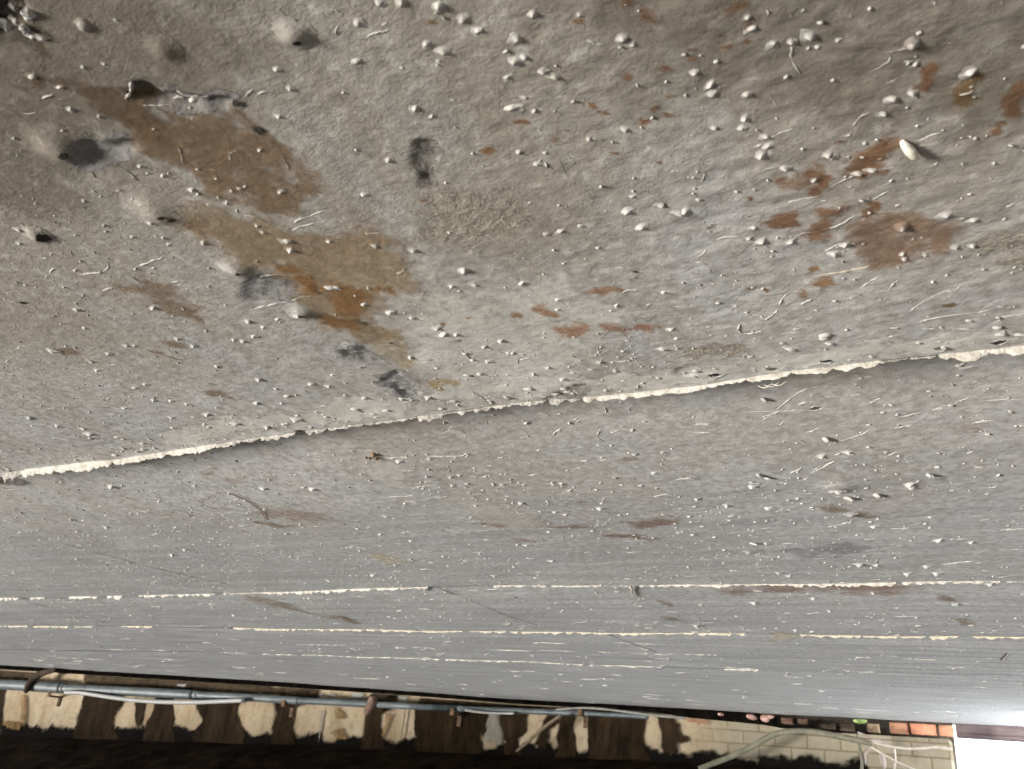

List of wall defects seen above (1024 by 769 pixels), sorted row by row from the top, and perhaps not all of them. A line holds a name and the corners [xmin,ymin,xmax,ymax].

rust [913,63,939,92]
rust [952,73,983,108]
rust [990,79,1024,136]
rust [845,137,901,180]
water stain [25,73,1022,400]
rust [760,164,958,270]
rust [275,264,395,330]
rust [585,286,624,296]
rust [799,266,836,298]
rust [511,304,660,338]